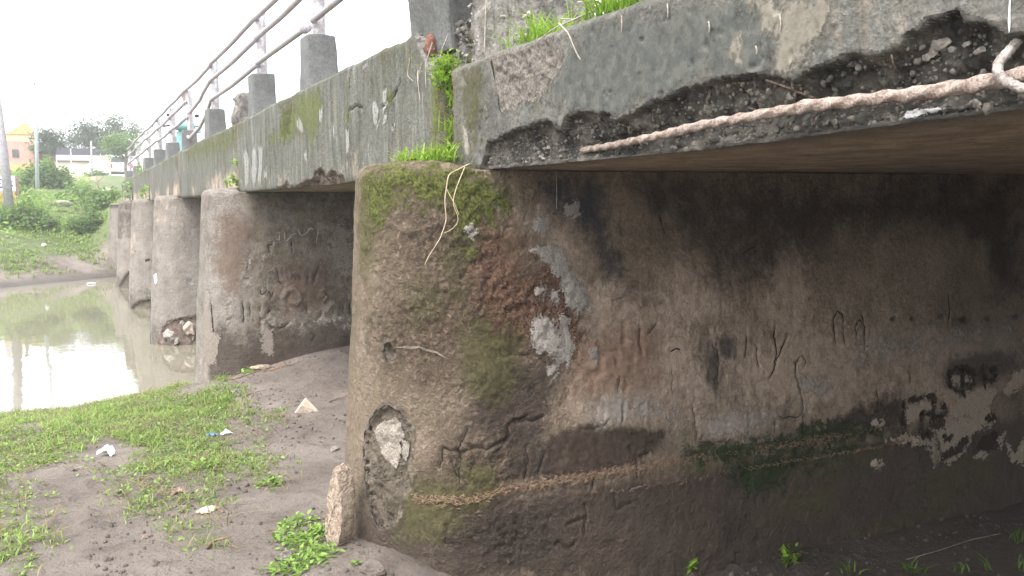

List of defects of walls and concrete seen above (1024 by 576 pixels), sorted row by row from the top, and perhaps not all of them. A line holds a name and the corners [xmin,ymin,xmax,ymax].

spalling [479,0,1024,170]
peeling [462,222,479,241]
peeling [563,200,583,222]
water stain [538,179,620,277]
spalling [155,278,221,369]
peeling [257,310,275,357]
peeling [528,210,600,382]
spalling [325,402,415,546]
crack [439,415,544,483]
water stain [543,391,676,478]
water stain [836,399,906,438]
peeling [871,363,1024,469]